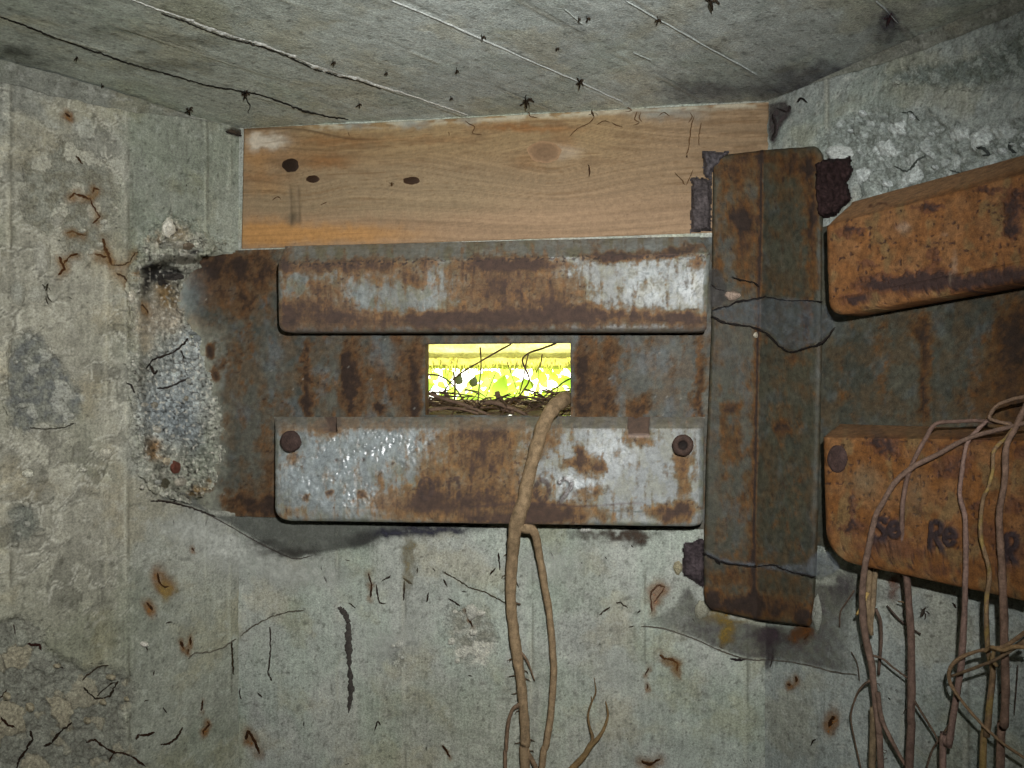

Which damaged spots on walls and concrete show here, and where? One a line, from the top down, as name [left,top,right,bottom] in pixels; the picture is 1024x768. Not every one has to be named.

crack [0,17,348,120]
crack [161,13,381,89]
spalling [121,210,227,504]
spalling [0,611,145,768]
crack [188,610,304,681]